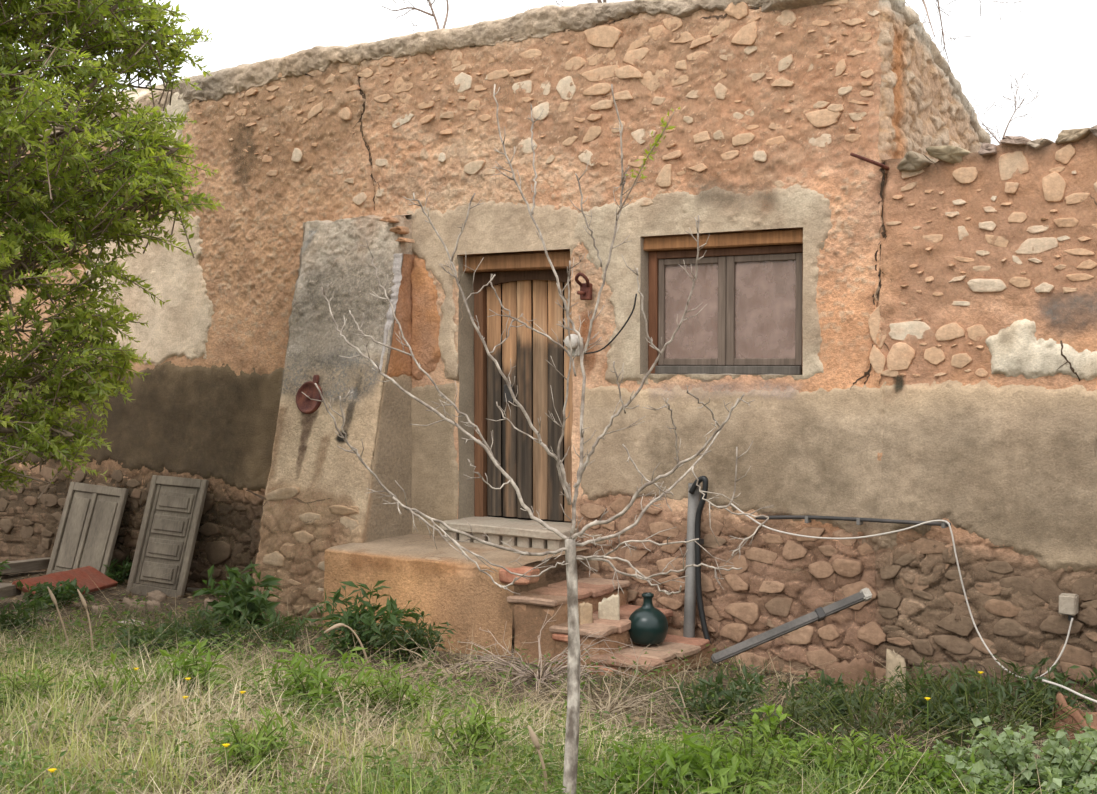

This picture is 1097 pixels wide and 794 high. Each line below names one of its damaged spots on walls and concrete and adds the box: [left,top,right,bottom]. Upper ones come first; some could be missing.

crack [353,77,380,210]
flaking render [379,217,441,380]
crack [851,343,889,387]
crack [872,161,887,309]
crack [1057,340,1080,381]
spalling [0,459,159,567]
spalling [579,496,1097,704]